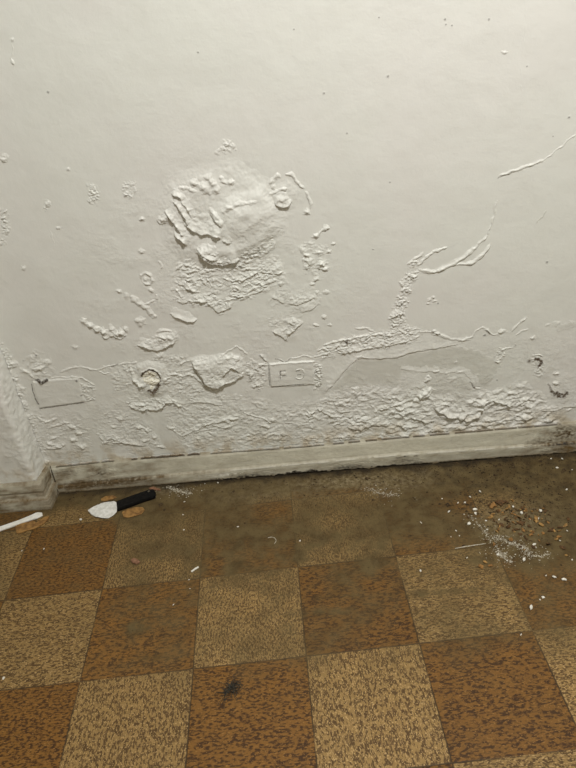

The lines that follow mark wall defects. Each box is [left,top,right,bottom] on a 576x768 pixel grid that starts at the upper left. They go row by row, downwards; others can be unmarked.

spalling [128,360,172,398]
damp [55,464,170,493]
damp [196,460,439,481]